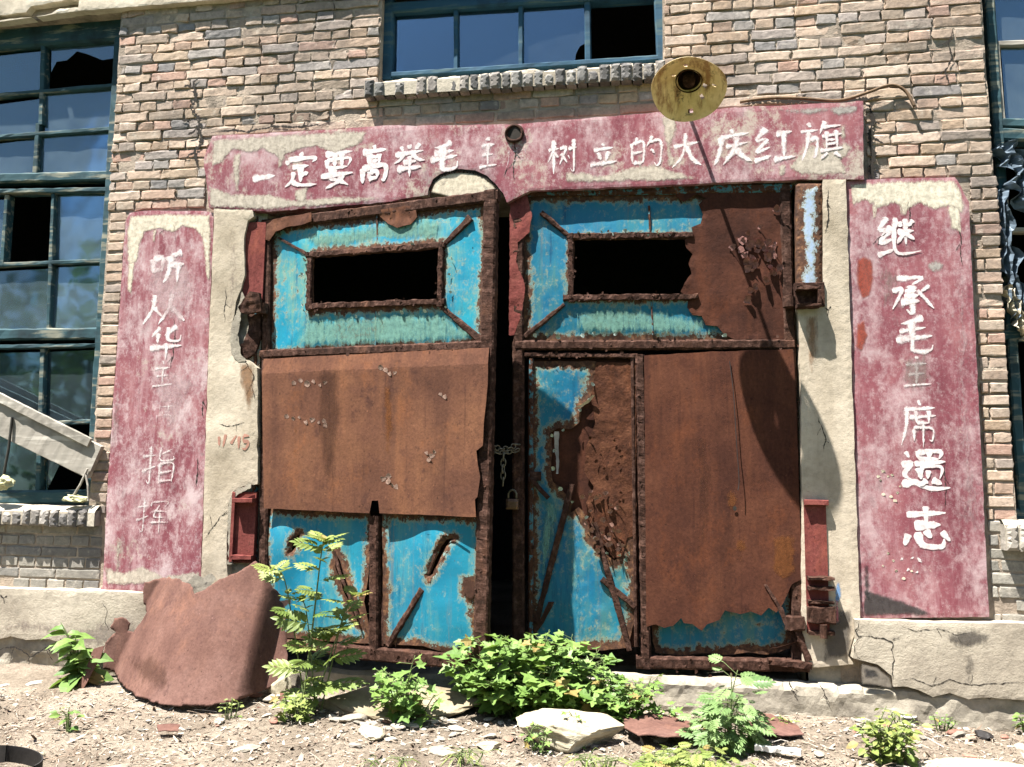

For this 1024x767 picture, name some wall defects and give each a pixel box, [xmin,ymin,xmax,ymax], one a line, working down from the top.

peeling [127,78,371,291]
peeling [744,94,963,231]
rust [728,224,783,304]
crack [854,623,1016,686]